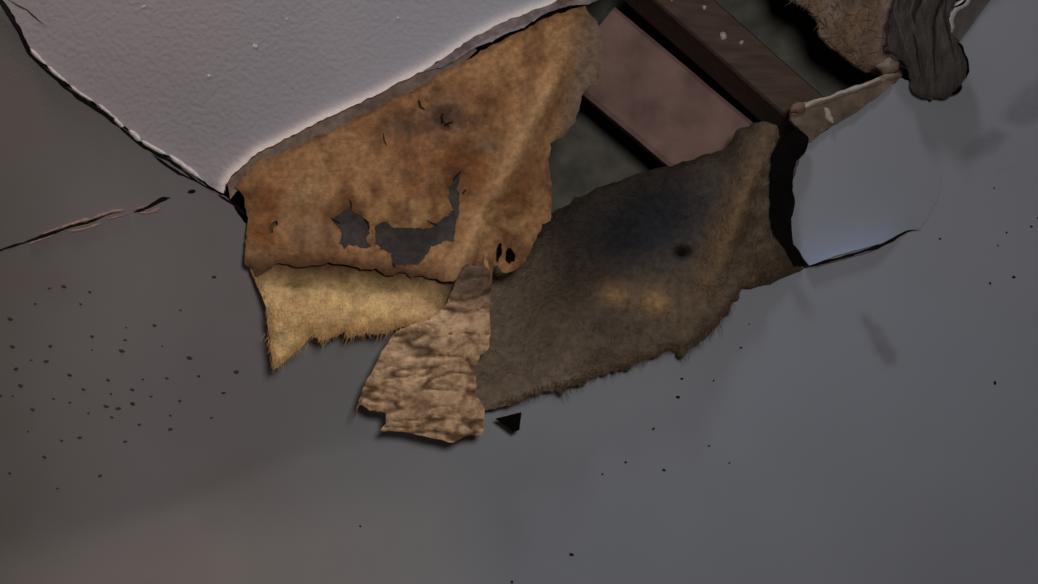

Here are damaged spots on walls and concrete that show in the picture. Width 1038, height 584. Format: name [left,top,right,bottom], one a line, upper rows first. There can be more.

crack [0,0,246,251]
peeling [791,99,943,265]